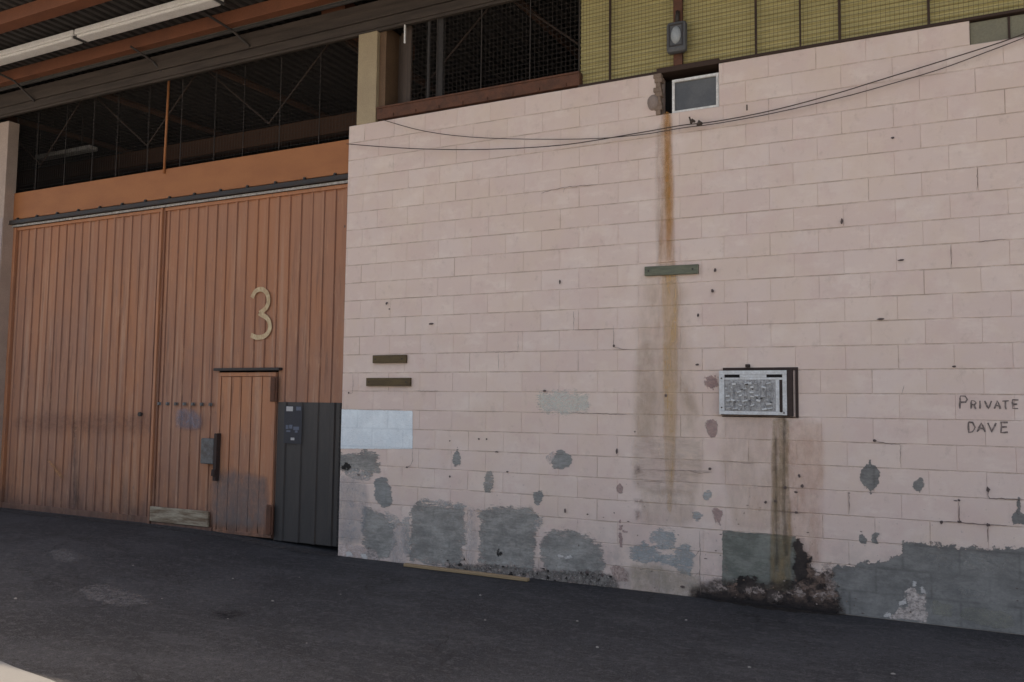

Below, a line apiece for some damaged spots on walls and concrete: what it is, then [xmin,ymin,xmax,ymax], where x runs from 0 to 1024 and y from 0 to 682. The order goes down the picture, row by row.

spalling [680,532,847,614]
peeling [884,580,929,623]